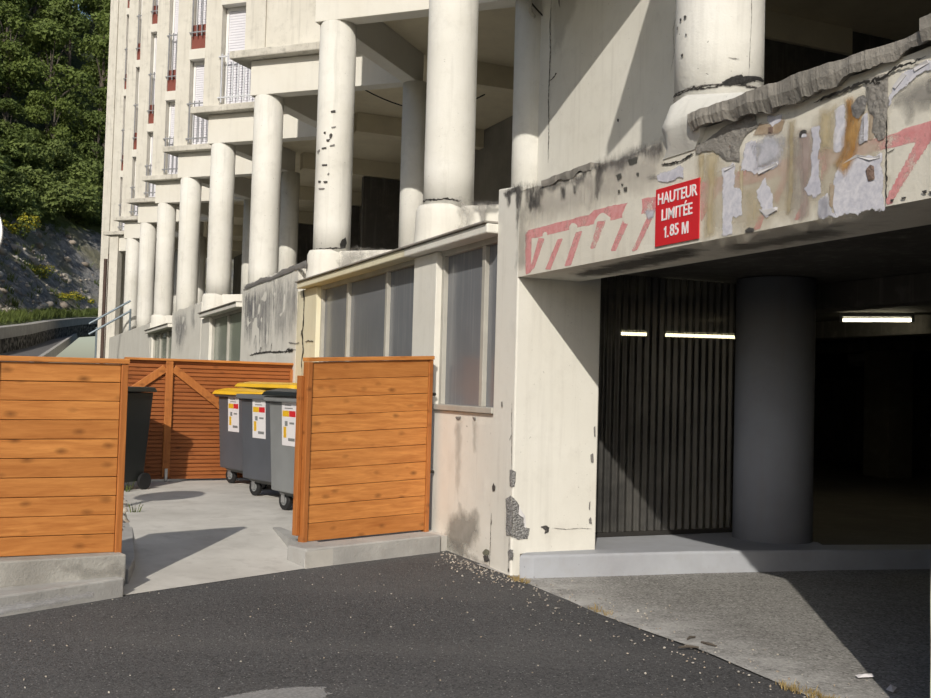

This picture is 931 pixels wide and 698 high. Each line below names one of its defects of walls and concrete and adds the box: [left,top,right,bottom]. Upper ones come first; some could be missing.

leakage [461,174,584,221]
leakage [595,142,662,198]
spalling [695,114,785,236]
rust [836,100,861,171]
peeling [799,60,931,219]
crack [251,278,313,368]
spalling [506,470,530,540]